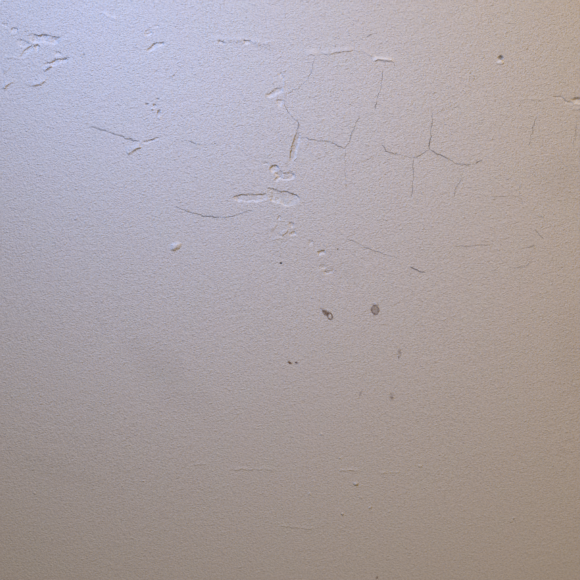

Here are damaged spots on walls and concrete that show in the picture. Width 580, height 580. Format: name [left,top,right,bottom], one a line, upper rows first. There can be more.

peeling [0,21,76,95]
crack [258,70,293,109]
crack [85,124,164,159]
crack [288,123,305,170]
spalling [224,161,312,216]